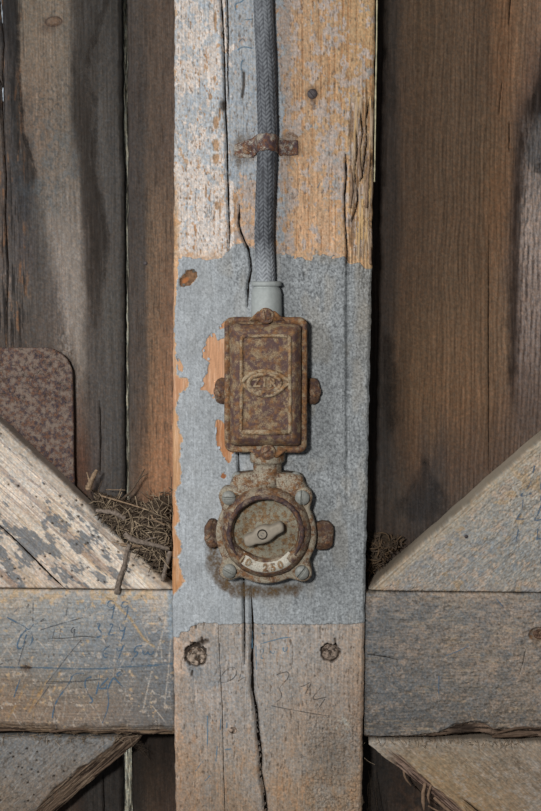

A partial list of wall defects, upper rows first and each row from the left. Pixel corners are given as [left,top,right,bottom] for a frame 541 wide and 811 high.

crack [344,102,369,264]
peeling [173,269,197,325]
peeling [200,322,225,398]
peeling [172,335,190,593]
peeling [215,420,234,463]
rust [207,547,297,597]
crack [243,578,267,811]